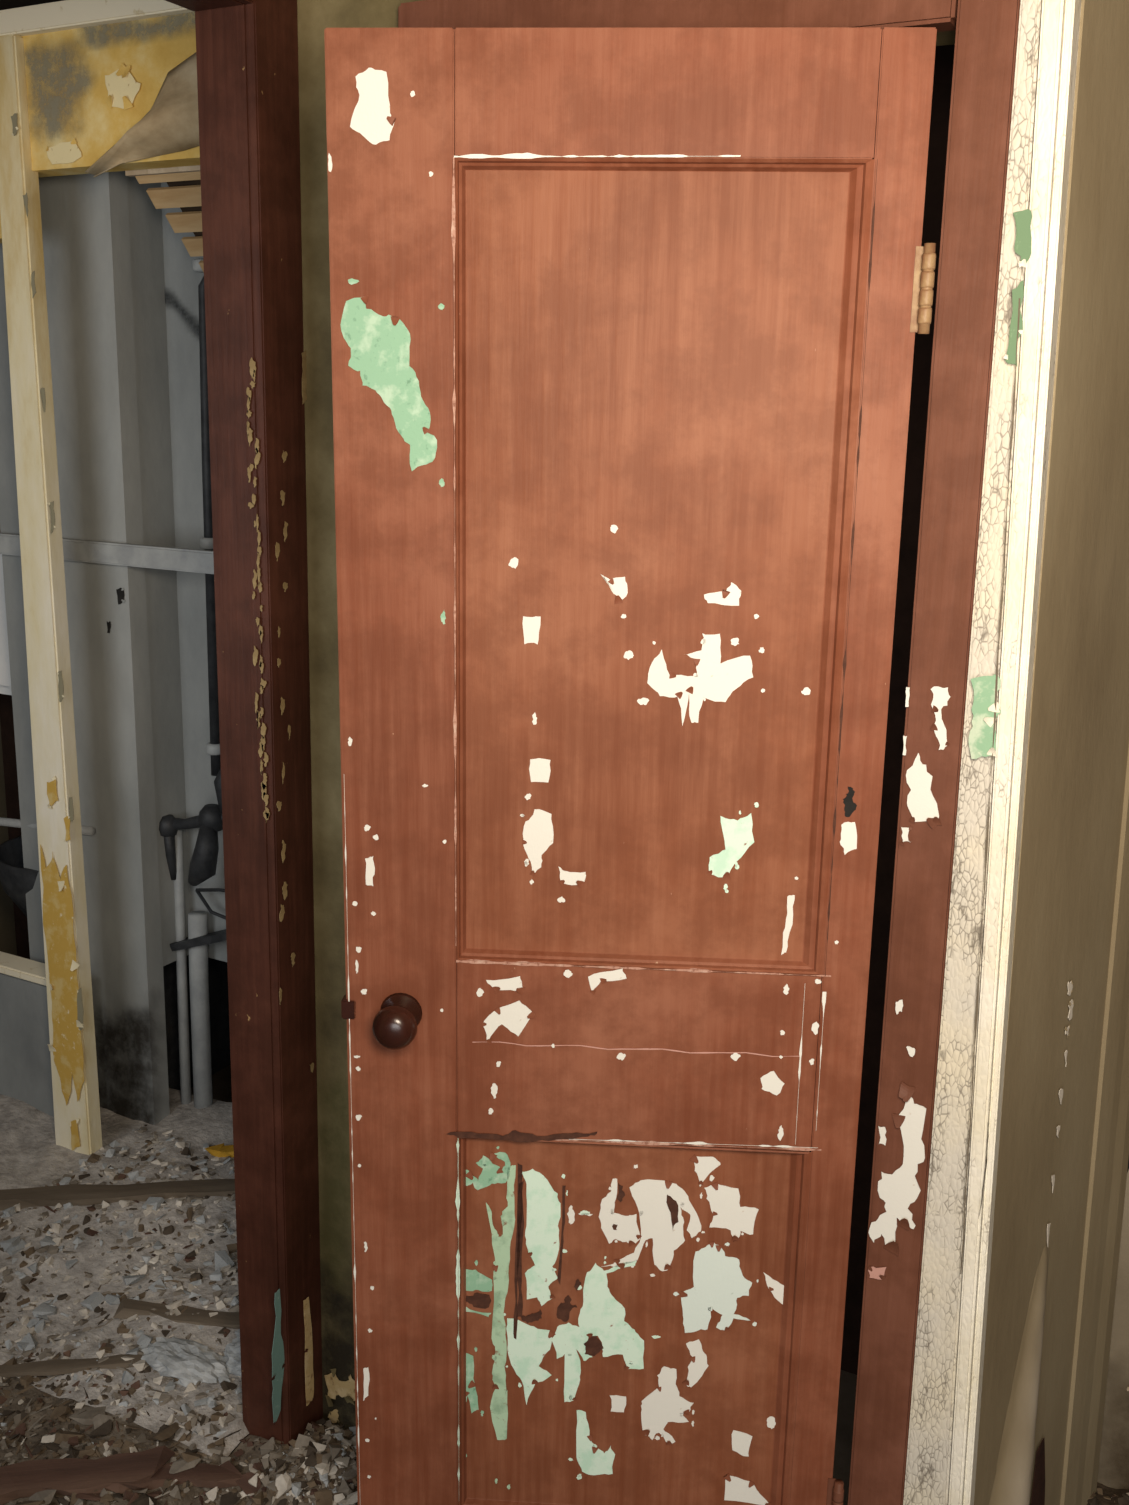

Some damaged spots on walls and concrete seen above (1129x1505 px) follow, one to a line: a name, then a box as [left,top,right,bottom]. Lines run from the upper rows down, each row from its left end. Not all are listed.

peeling [340,278,437,471]
peeling [522,616,541,645]
peeling [601,575,628,618]
peeling [637,633,765,726]
peeling [704,582,741,606]
peeling [930,686,950,750]
peeling [520,758,586,903]
peeling [707,802,759,893]
peeling [900,735,942,846]
peeling [40,845,85,1150]
peeling [867,1082,926,1280]
peeling [466,1146,784,1480]